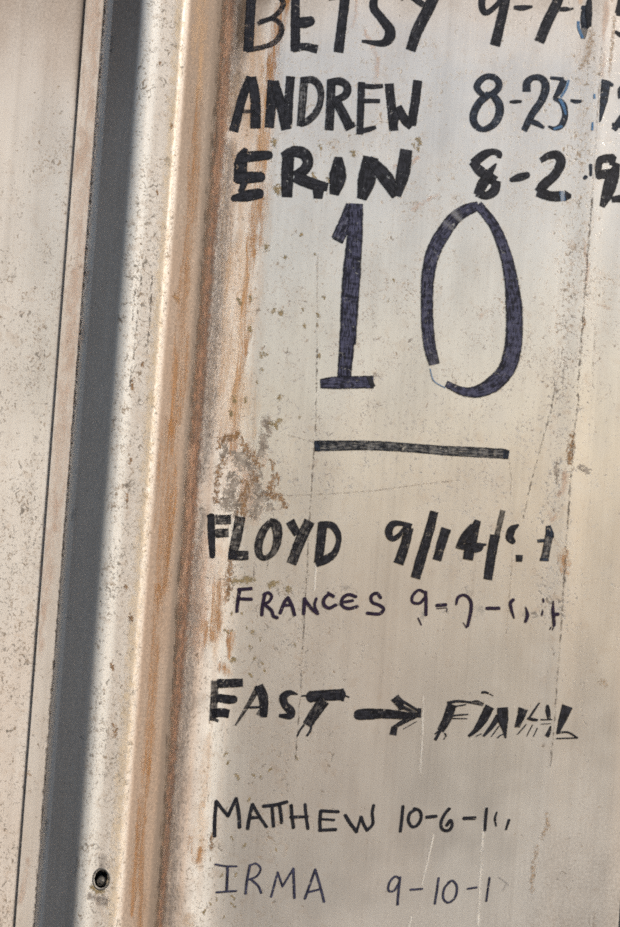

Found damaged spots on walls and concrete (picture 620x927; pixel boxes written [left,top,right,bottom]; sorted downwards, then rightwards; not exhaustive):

corrosion [267,0,290,80]
corrosion [258,90,277,170]
corrosion [211,198,288,520]
corrosion [157,0,236,927]
corrosion [202,560,256,673]